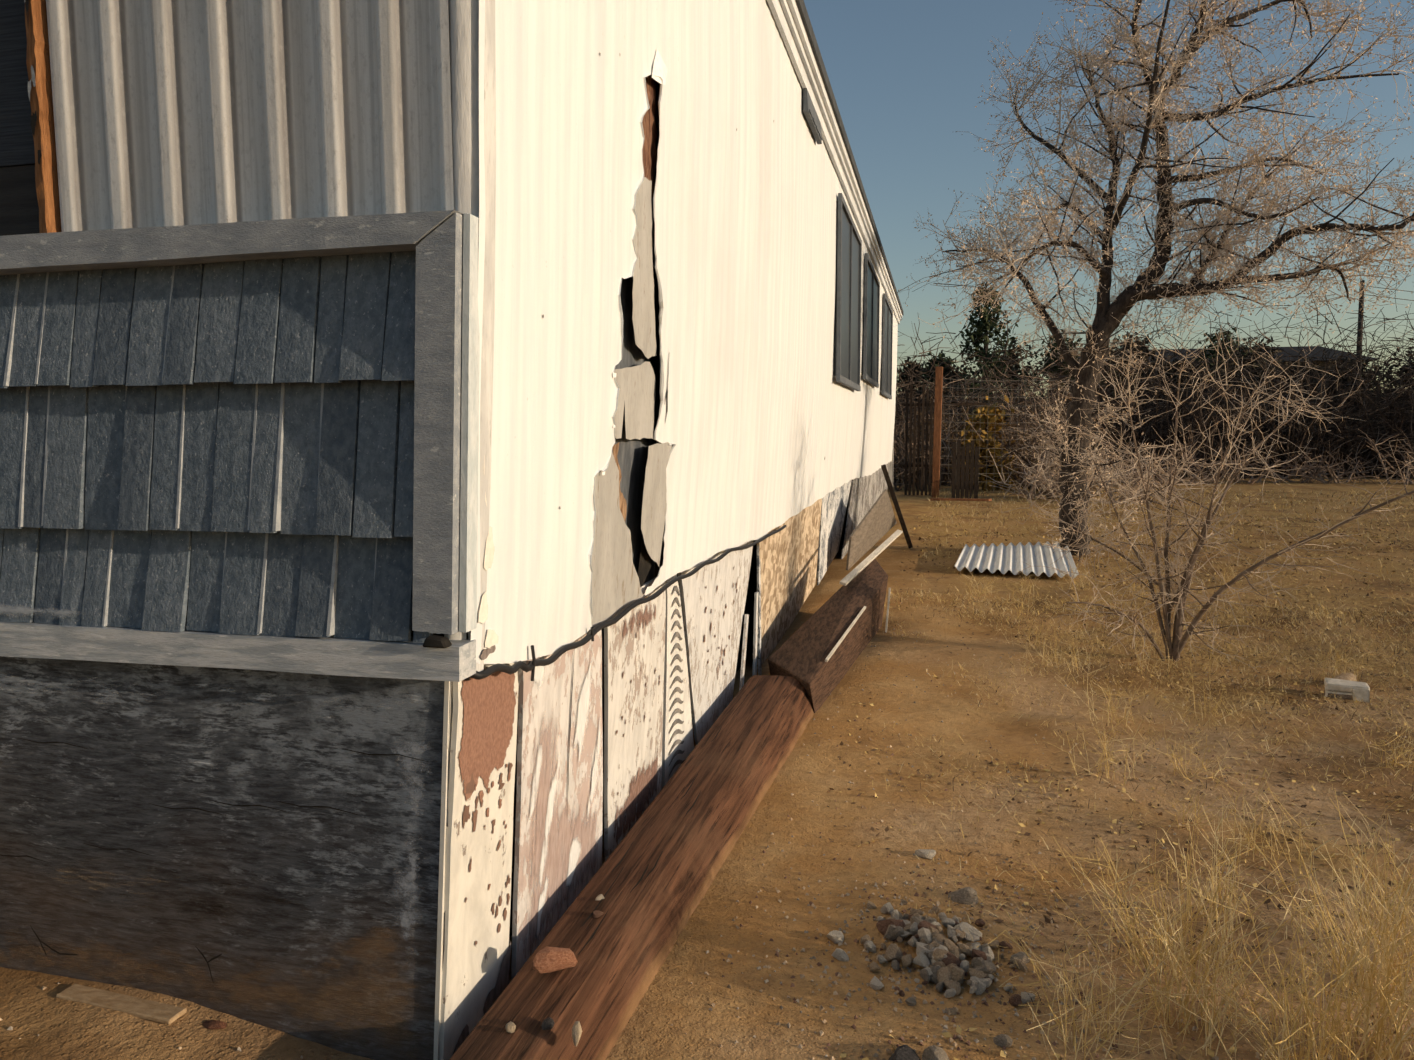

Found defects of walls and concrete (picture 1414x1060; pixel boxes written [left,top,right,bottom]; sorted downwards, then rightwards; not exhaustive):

peeling [458,592,518,851]
peeling [534,656,544,686]
peeling [618,605,659,648]
peeling [529,662,660,951]
peeling [483,875,511,1015]
peeling [453,1024,469,1054]